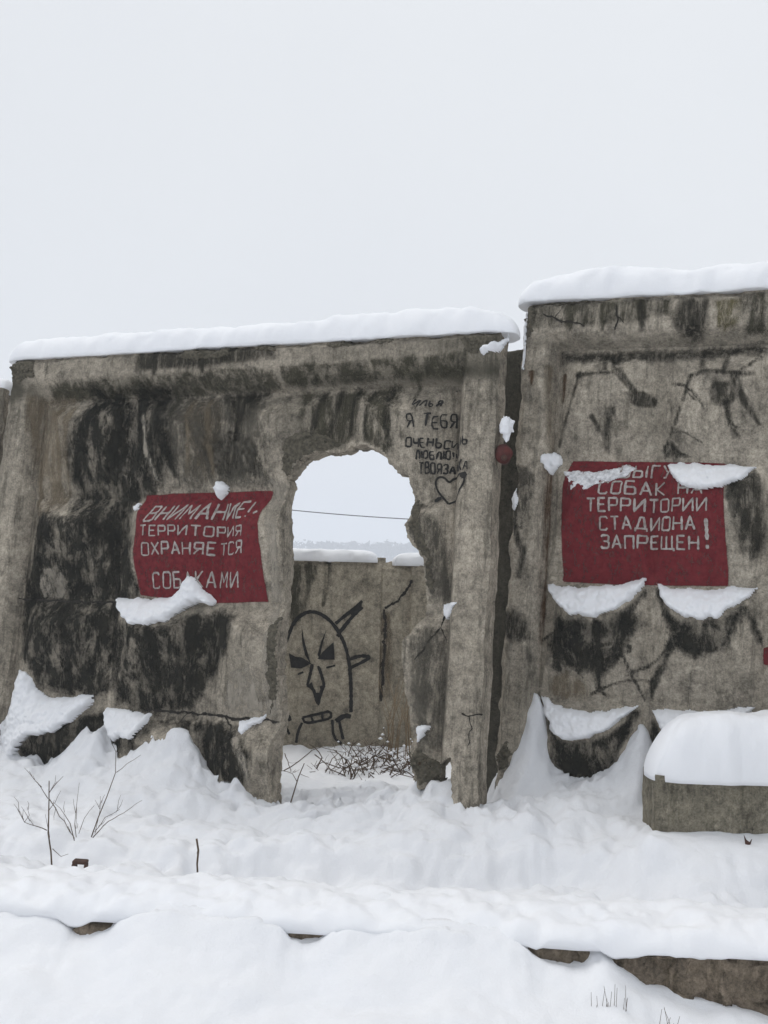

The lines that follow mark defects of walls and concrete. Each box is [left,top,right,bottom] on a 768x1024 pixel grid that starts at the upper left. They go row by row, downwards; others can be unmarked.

water stain [299,387,402,453]
water stain [559,299,766,457]
water stain [19,346,331,787]
spalling [408,500,434,594]
water stain [409,512,451,602]
water stain [411,629,450,751]
water stain [548,590,763,698]